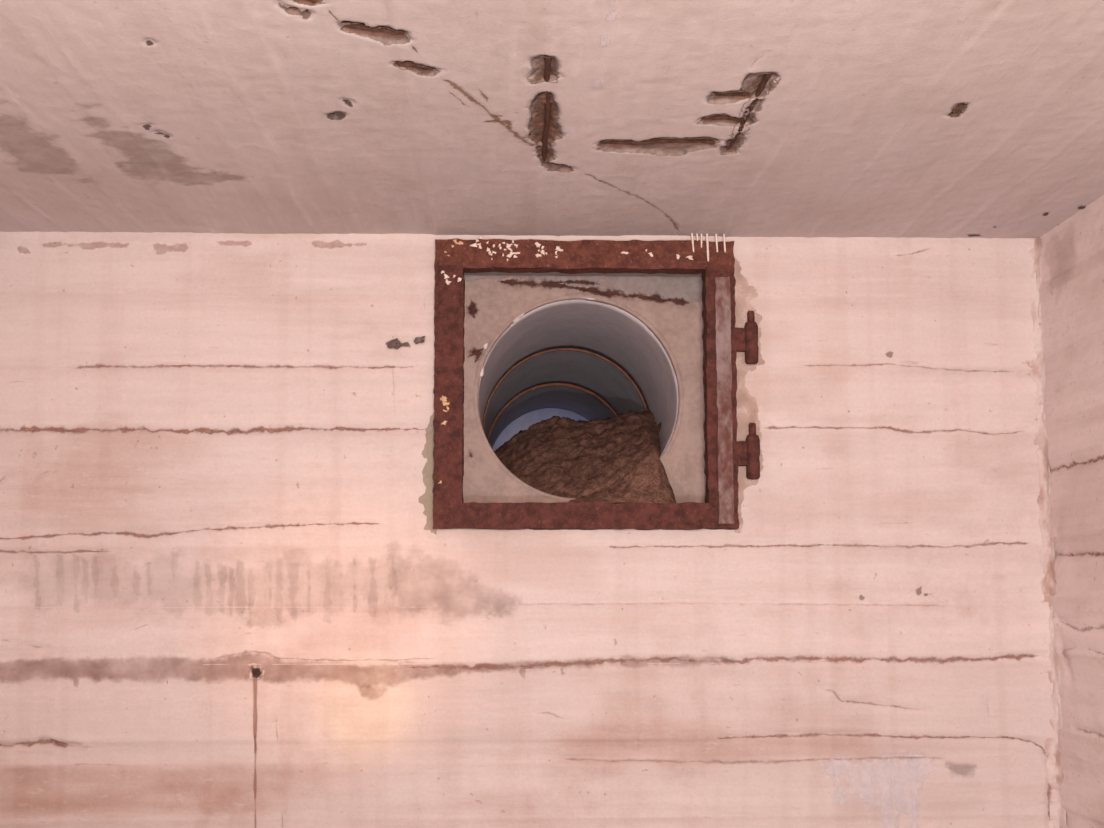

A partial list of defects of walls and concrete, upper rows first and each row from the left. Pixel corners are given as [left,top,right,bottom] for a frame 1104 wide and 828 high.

spalling [278,0,324,19]
spalling [338,20,411,45]
spalling [393,61,440,76]
crack [445,80,534,146]
spalling [527,55,575,173]
spalling [595,72,778,156]